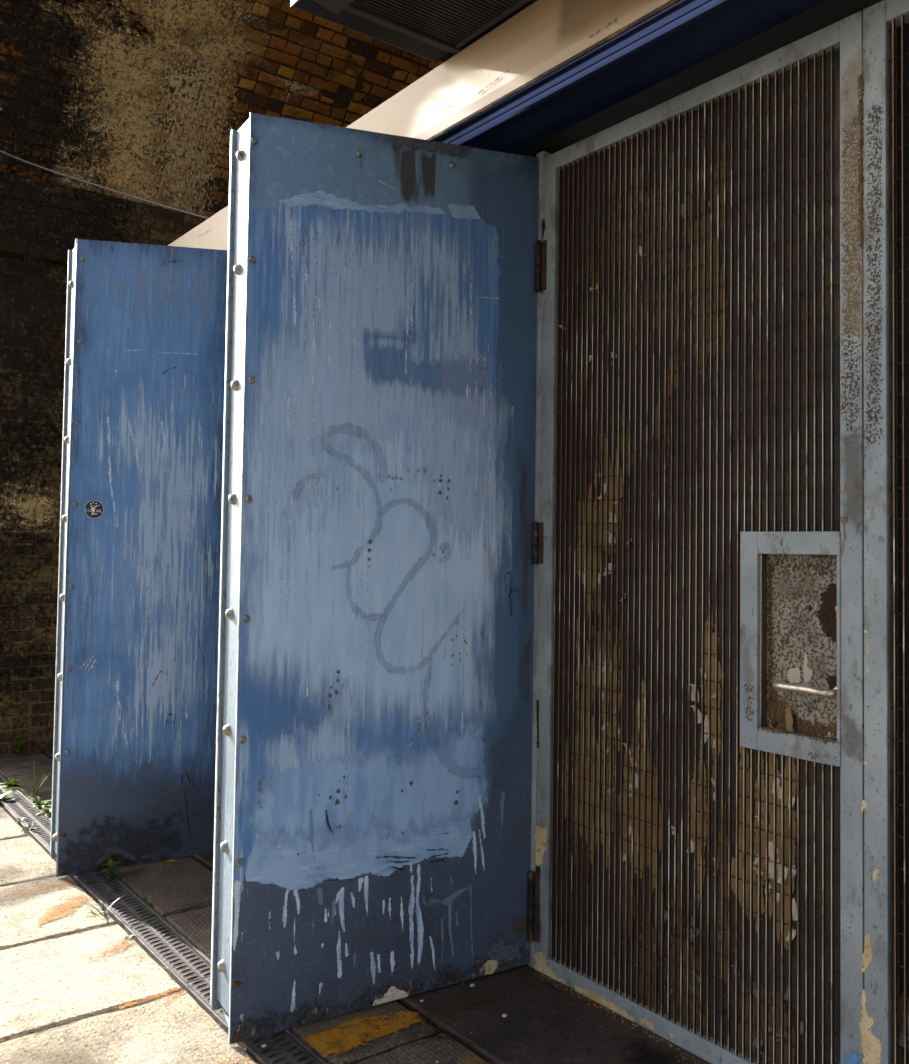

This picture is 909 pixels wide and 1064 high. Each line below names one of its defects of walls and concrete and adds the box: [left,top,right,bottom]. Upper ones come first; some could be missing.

water stain [54,0,320,216]
rust [857,73,865,248]
rust [757,555,837,744]
spalling [373,986,408,1006]
peeling [861,931,873,972]
peeling [859,989,881,1064]